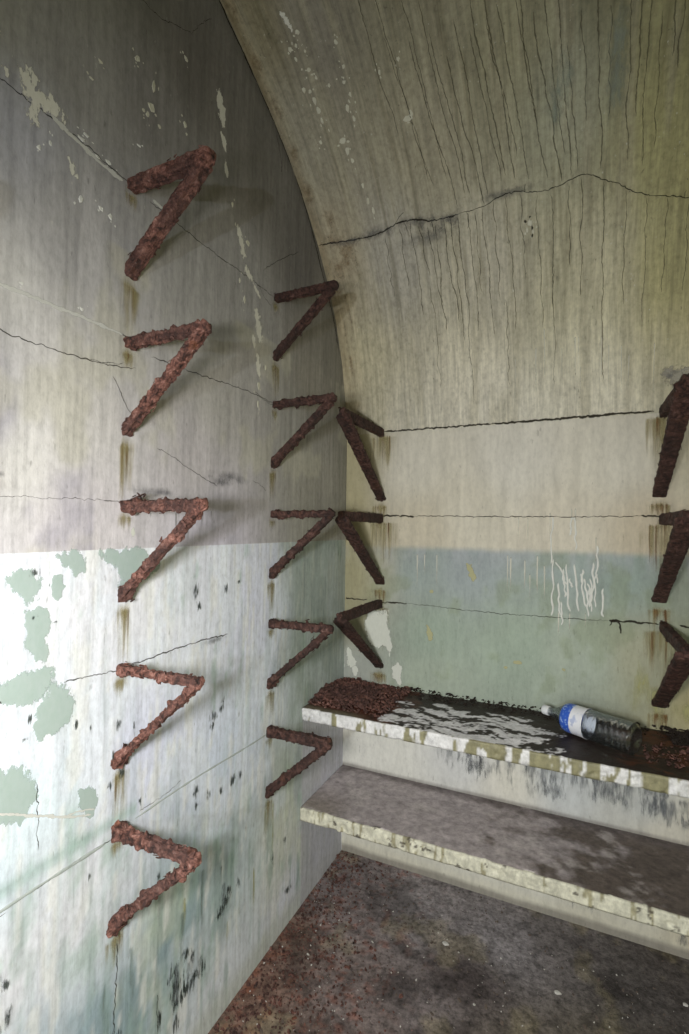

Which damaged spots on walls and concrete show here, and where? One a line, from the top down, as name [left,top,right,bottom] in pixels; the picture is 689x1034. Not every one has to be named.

crack [73,134,127,181]
crack [143,0,689,356]
crack [384,411,654,432]
peeling [99,527,160,589]
leakage [507,514,604,630]
peeling [0,549,86,742]
crack [64,633,228,683]
peeling [344,647,359,676]
peeling [364,610,402,685]
peeling [0,765,39,827]
peeling [78,787,98,819]
leakage [158,947,205,1034]